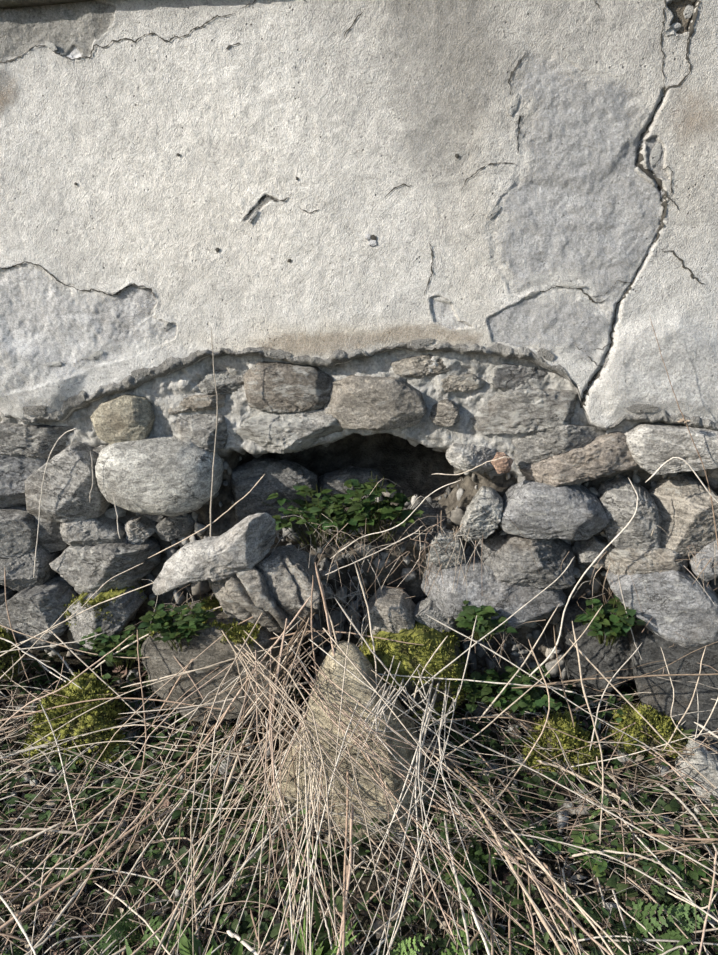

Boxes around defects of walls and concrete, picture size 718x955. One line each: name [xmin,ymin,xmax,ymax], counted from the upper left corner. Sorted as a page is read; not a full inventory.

spalling [0,1,115,61]
crack [0,0,255,63]
crack [244,193,319,217]
spalling [487,65,670,294]
crack [529,0,704,408]
spalling [0,269,177,389]
spalling [1,291,718,431]